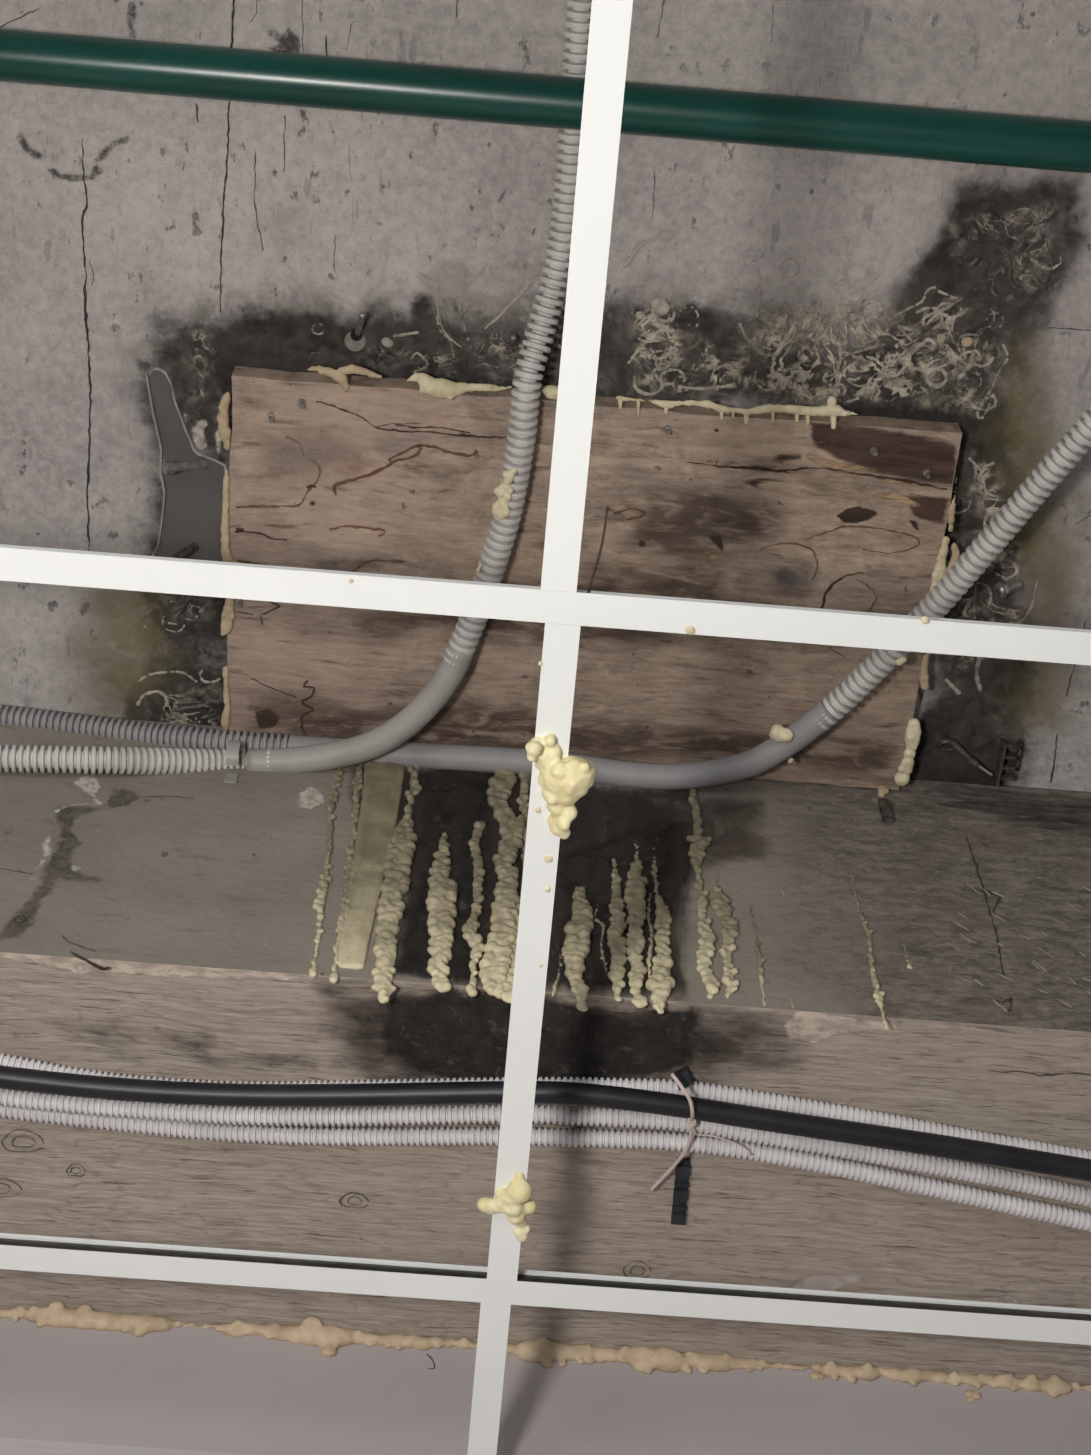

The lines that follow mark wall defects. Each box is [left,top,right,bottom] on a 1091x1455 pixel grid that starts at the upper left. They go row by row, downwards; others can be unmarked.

crack [230,0,257,48]
crack [301,0,353,56]
crack [196,101,286,312]
crack [81,138,94,547]
water stain [139,296,564,475]
water stain [595,181,1083,567]
water stain [88,590,227,727]
water stain [485,619,523,629]
water stain [580,628,661,646]
water stain [569,728,770,754]
water stain [910,654,1052,786]
water stain [944,503,1064,625]